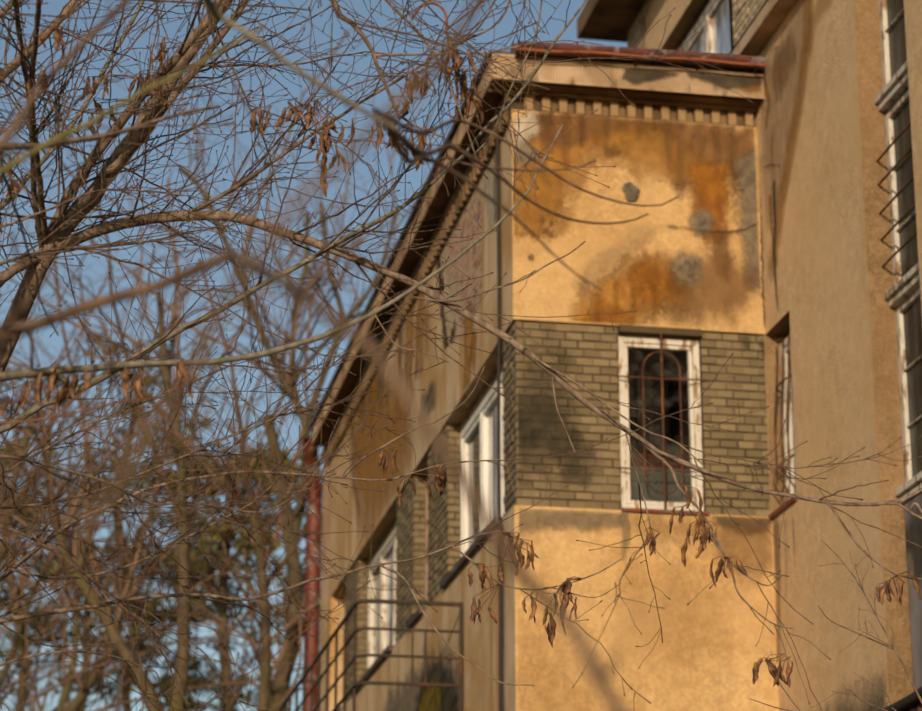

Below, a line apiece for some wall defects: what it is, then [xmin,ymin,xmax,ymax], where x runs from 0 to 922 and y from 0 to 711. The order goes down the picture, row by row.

spalling [622,182,640,201]
water stain [513,0,808,323]
spalling [689,210,715,235]
rust [691,163,731,270]
crack [666,130,780,326]
water stain [385,647,459,711]